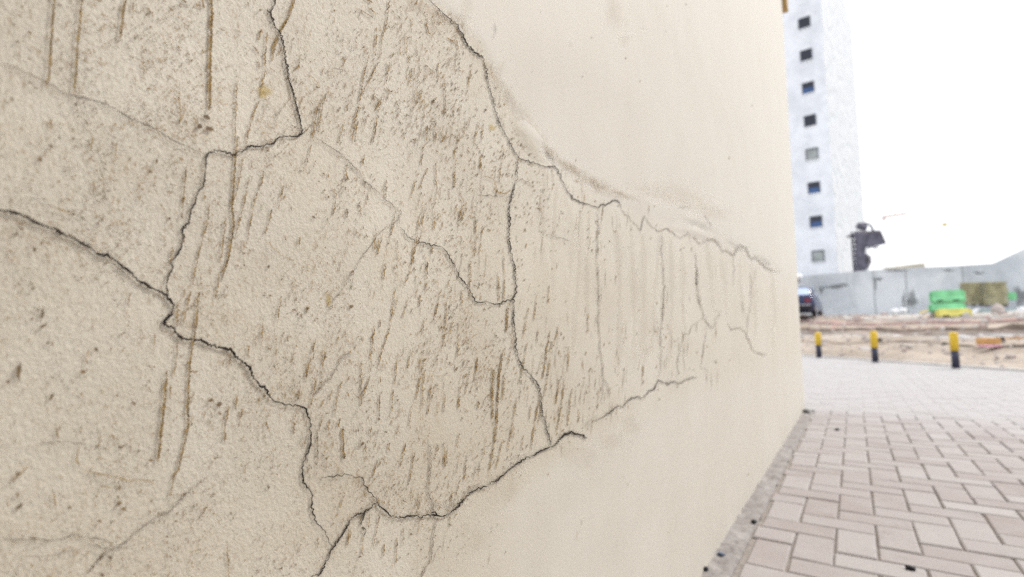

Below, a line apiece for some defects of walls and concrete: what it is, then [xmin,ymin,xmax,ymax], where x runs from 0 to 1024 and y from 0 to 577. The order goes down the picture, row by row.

crack [0,0,775,577]